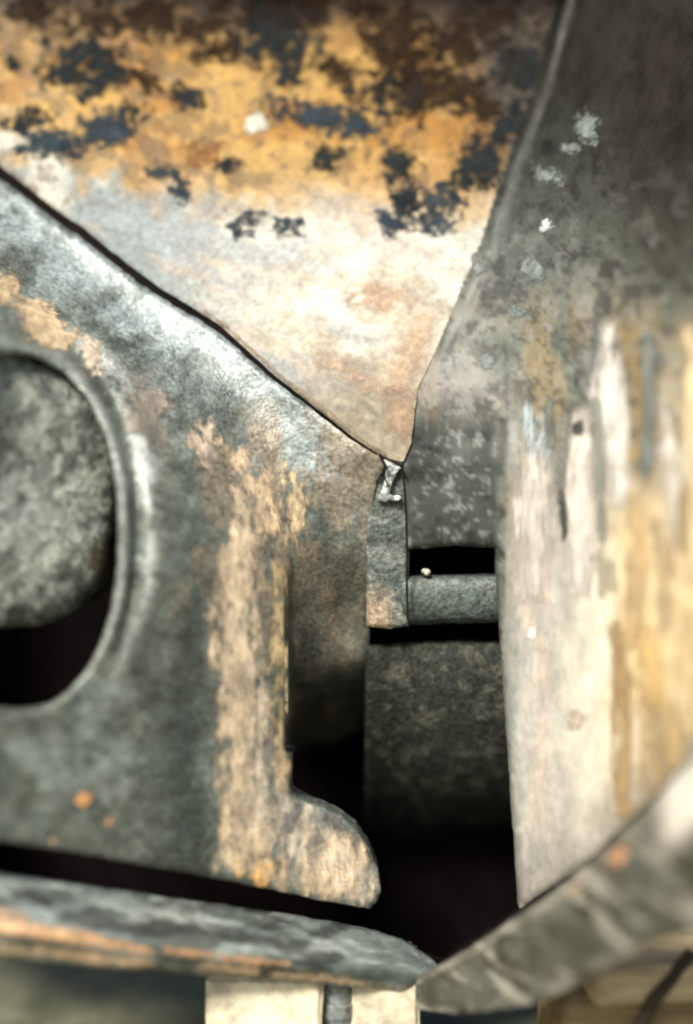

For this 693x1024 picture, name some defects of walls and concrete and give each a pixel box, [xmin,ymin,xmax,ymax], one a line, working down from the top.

corrosion [75,792,93,807]
corrosion [590,494,693,820]